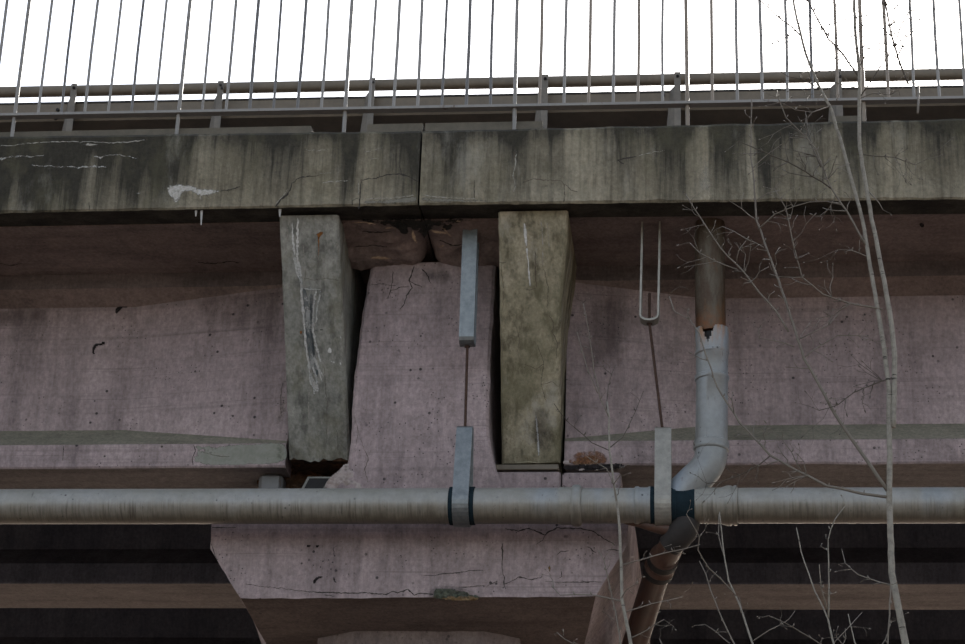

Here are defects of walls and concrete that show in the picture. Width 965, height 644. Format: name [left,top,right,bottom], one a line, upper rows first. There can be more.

efflorescence [167,185,240,202]
crack [275,149,417,209]
crack [371,267,431,309]
damp [286,218,323,437]
spalling [283,464,362,488]
crack [248,527,619,596]